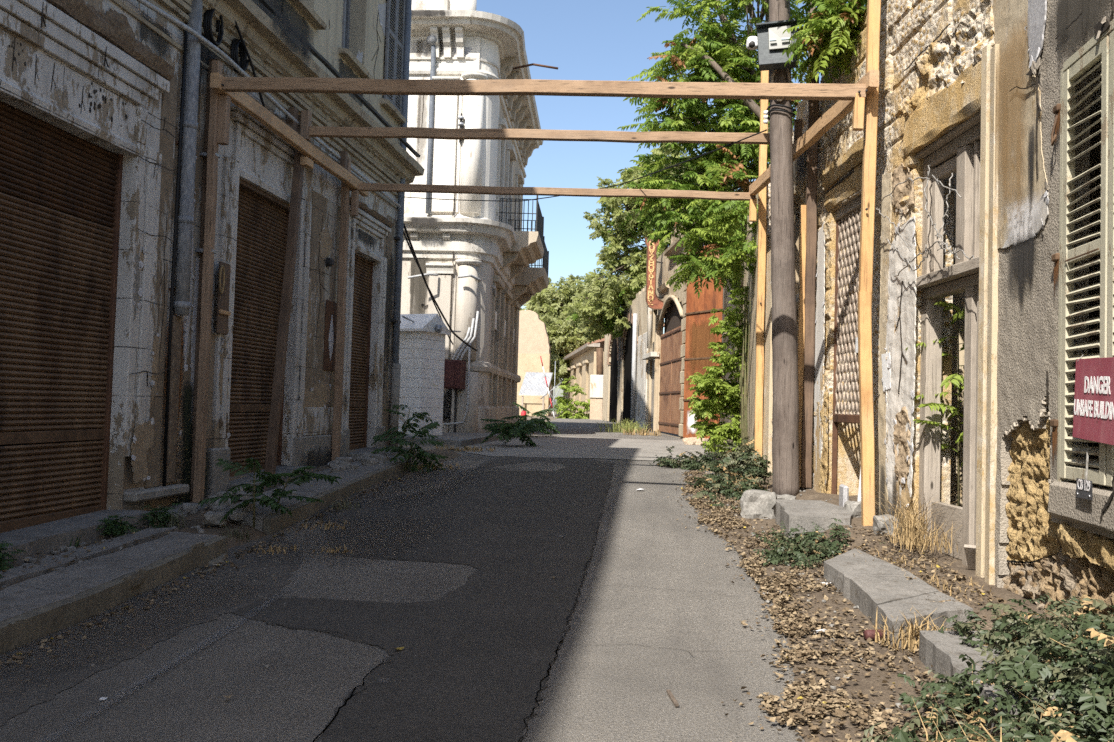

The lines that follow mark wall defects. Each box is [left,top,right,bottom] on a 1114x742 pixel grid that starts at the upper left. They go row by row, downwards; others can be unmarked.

spalling [79,81,128,127]
spalling [77,0,152,53]
peeling [899,0,1049,249]
peeling [875,163,917,530]
flaking render [1002,396,1114,647]
crack [266,624,394,742]